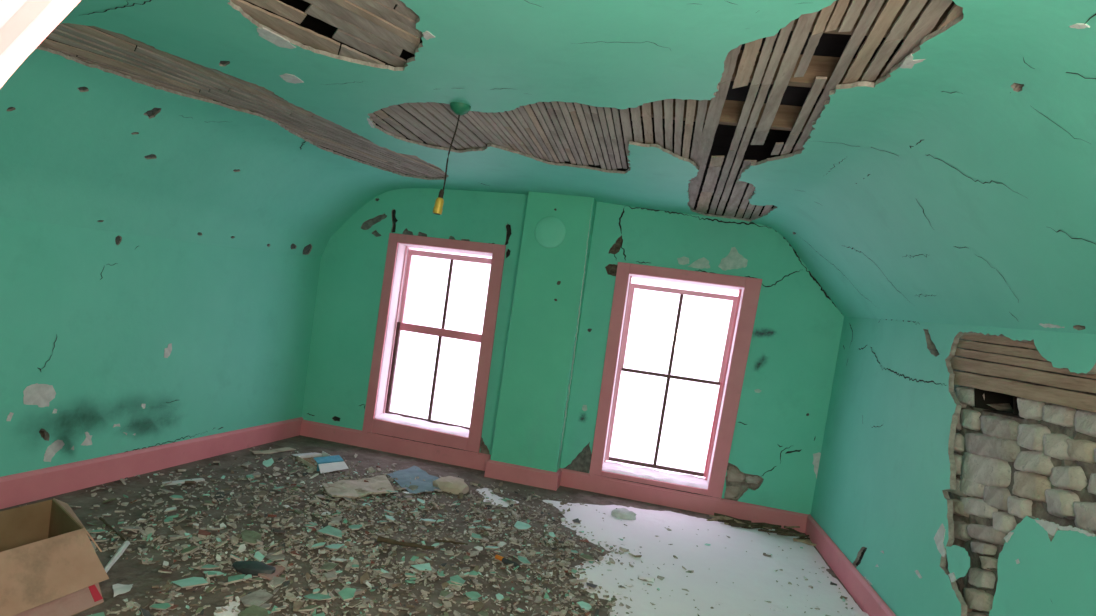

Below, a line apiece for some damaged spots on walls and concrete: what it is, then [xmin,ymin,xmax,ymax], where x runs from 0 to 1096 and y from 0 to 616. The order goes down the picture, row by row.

crack [83,0,151,15]
crack [1069,14,1096,29]
flaking render [256,27,296,49]
flaking render [900,53,925,69]
crack [808,140,1023,196]
spalling [361,209,427,237]
spalling [558,205,592,473]
flaking render [23,383,57,414]
hole [974,388,1021,414]
flaking render [39,429,92,462]
spalling [724,463,763,501]
flaking render [1035,519,1095,537]